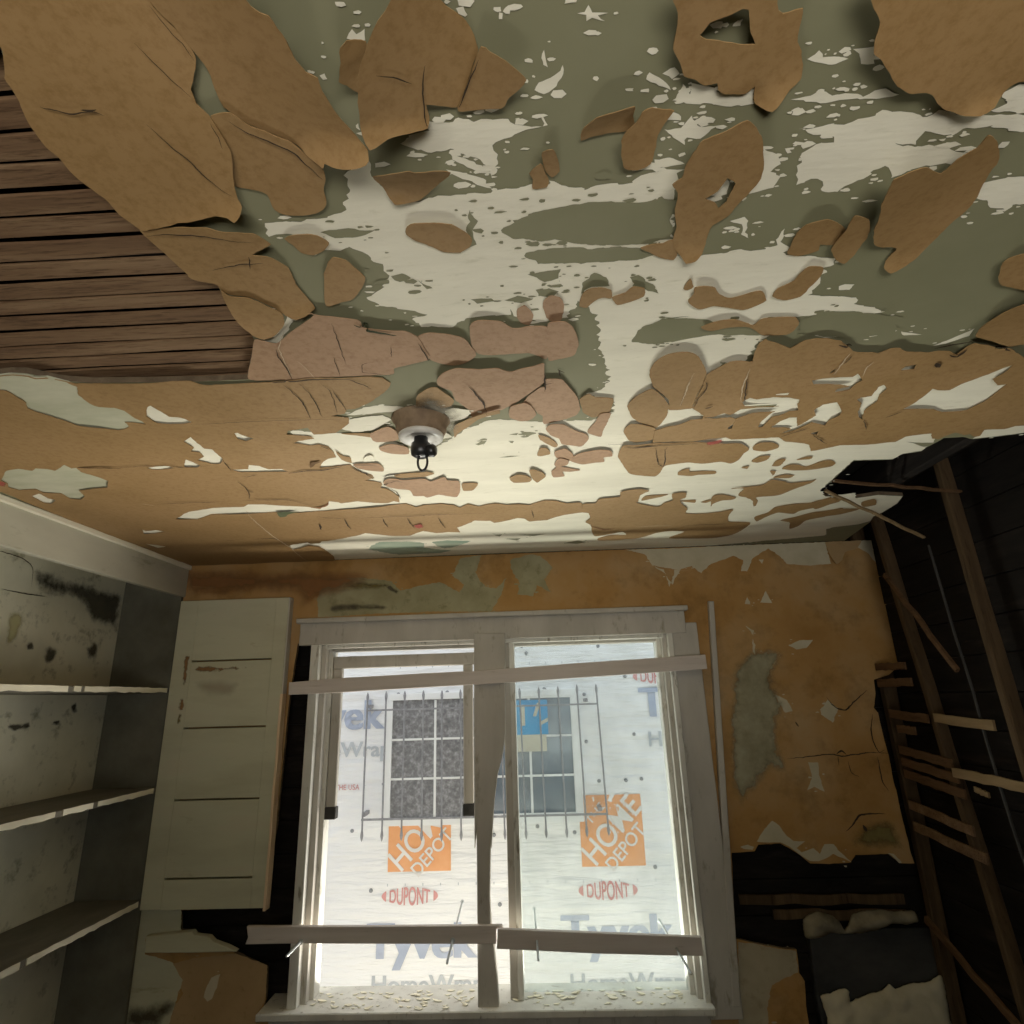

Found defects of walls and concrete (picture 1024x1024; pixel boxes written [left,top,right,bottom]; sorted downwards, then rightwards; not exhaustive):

flaking render [0,0,1024,617]
crack [251,322,396,420]
crack [681,378,713,409]
crack [740,370,750,401]
crack [835,343,871,375]
crack [935,341,1010,357]
damp [37,575,119,624]
flaking render [789,639,813,649]
flaking render [732,626,793,796]
crack [790,691,889,831]
flaking render [741,821,851,867]